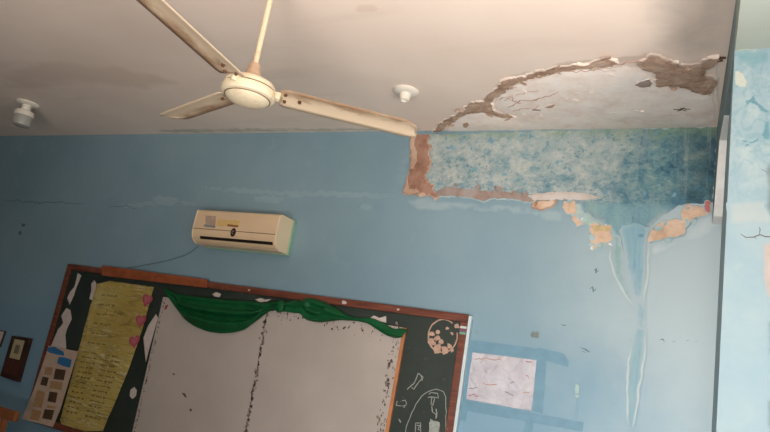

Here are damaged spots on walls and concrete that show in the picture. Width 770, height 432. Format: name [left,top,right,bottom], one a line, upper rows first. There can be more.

peeling [403,53,729,258]
crack [500,61,639,112]
water stain [200,182,650,432]